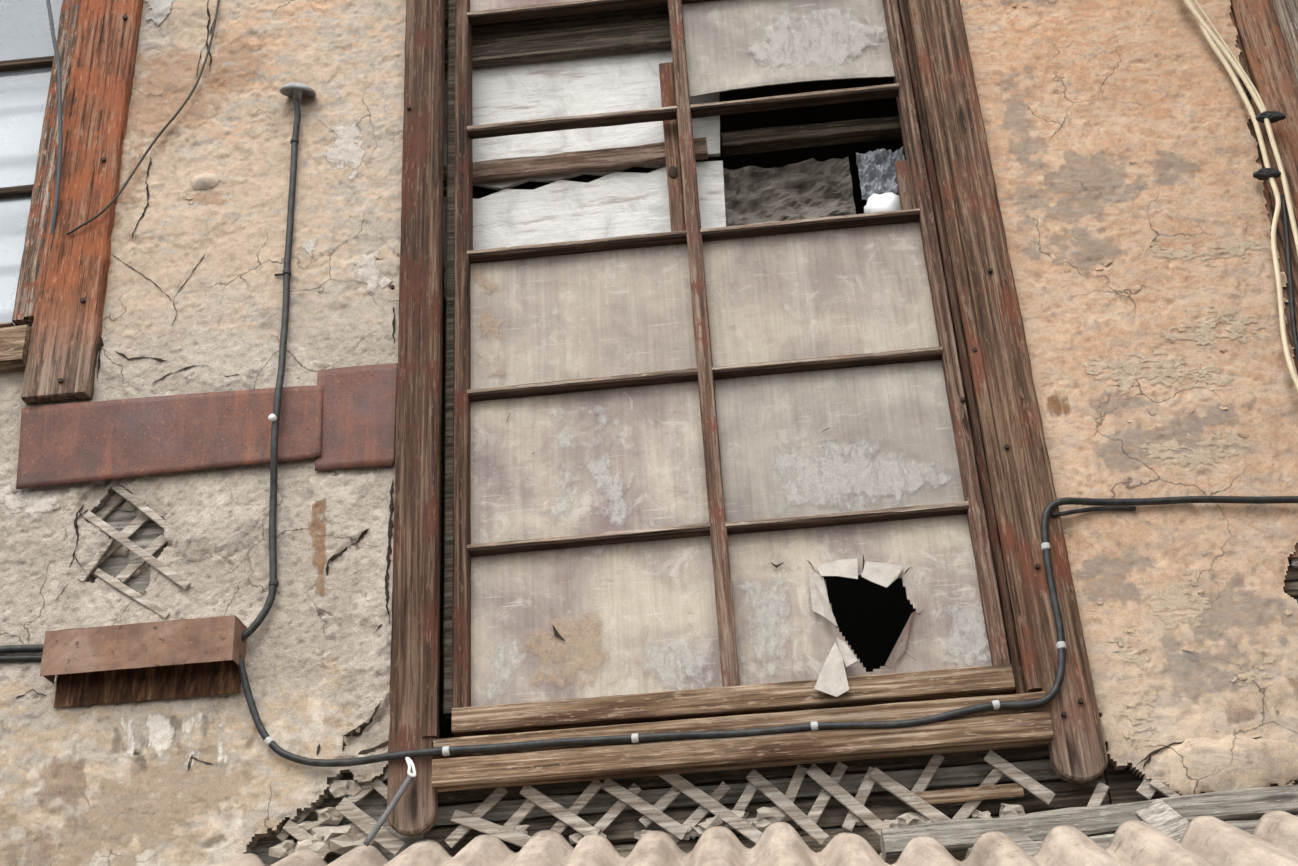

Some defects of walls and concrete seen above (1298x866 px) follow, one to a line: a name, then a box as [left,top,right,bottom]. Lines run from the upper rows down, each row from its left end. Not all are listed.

crack [111,157,205,326]
crack [97,326,239,383]
corrosion [310,498,326,596]
flaking render [1283,559,1298,616]
flaking render [252,766,423,866]